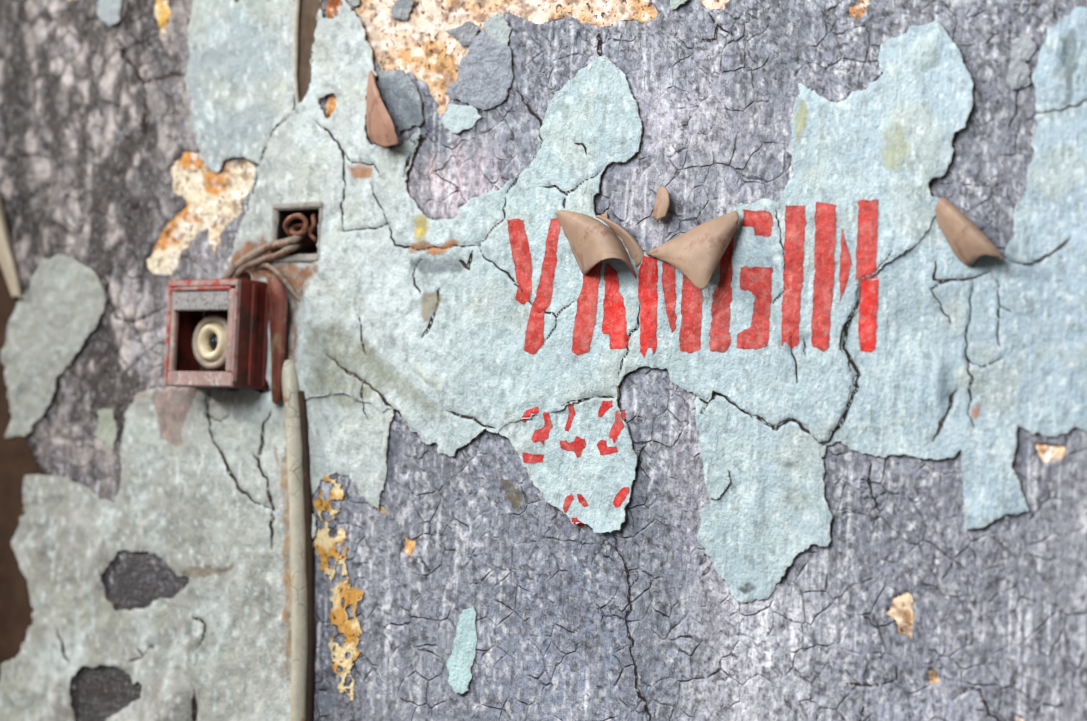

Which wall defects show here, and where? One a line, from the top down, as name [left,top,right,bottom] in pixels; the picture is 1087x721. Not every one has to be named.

peeling [147,0,1087,603]
peeling [0,196,292,721]
crack [206,389,275,549]
crack [867,460,885,511]
spalling [312,474,364,704]
peeling [446,606,478,694]
crack [612,535,651,721]
crack [845,666,897,721]
spalling [887,592,914,639]
spalling [929,669,940,684]
crack [952,686,1012,721]